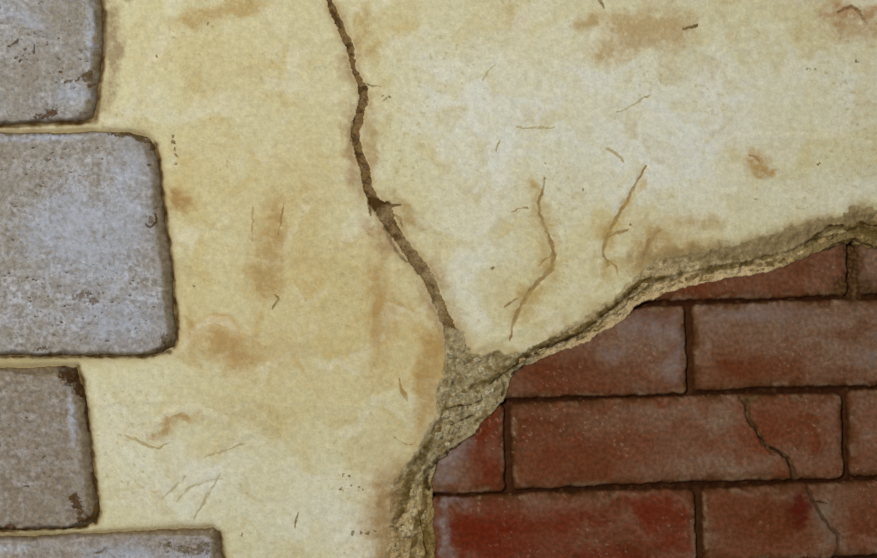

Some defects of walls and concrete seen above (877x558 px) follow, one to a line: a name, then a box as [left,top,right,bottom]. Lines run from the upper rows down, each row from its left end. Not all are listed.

crack [327,0,470,350]
crack [504,177,556,341]
crack [602,165,647,269]
flaking render [351,205,877,558]
crack [739,395,839,558]